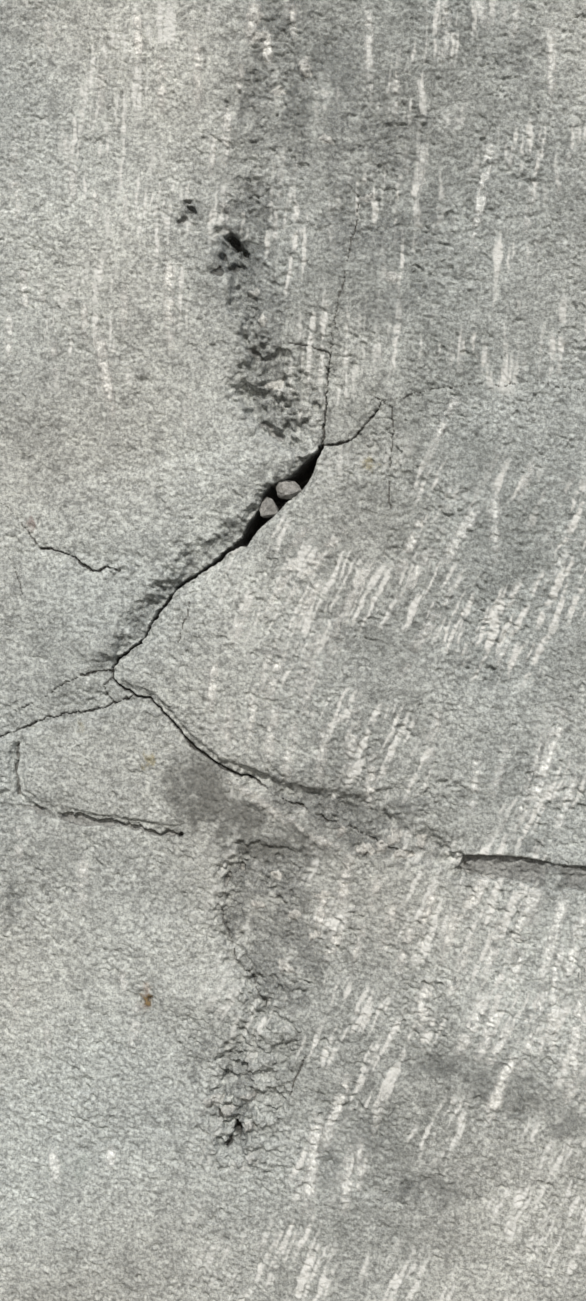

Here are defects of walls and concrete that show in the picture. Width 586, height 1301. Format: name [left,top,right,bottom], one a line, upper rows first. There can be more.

leakage [246,2,296,60]
leakage [210,112,231,164]
leakage [209,233,257,275]
crack [0,204,584,850]